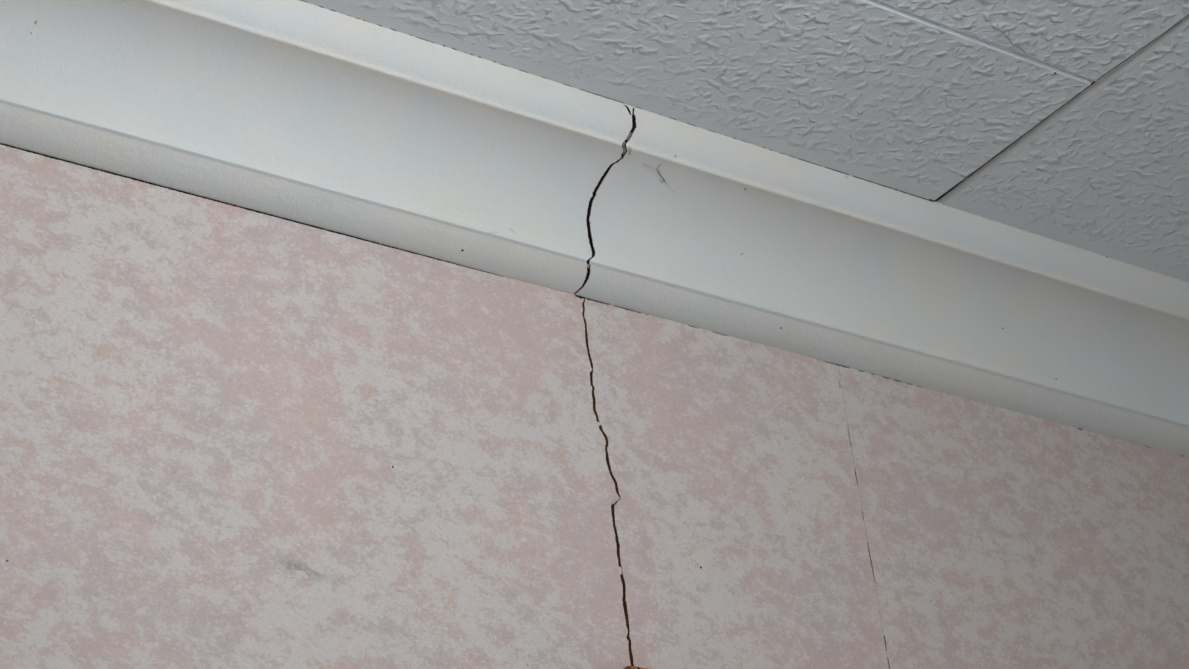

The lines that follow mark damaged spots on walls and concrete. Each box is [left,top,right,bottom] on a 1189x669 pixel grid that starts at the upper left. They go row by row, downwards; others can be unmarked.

crack [301,0,1189,669]